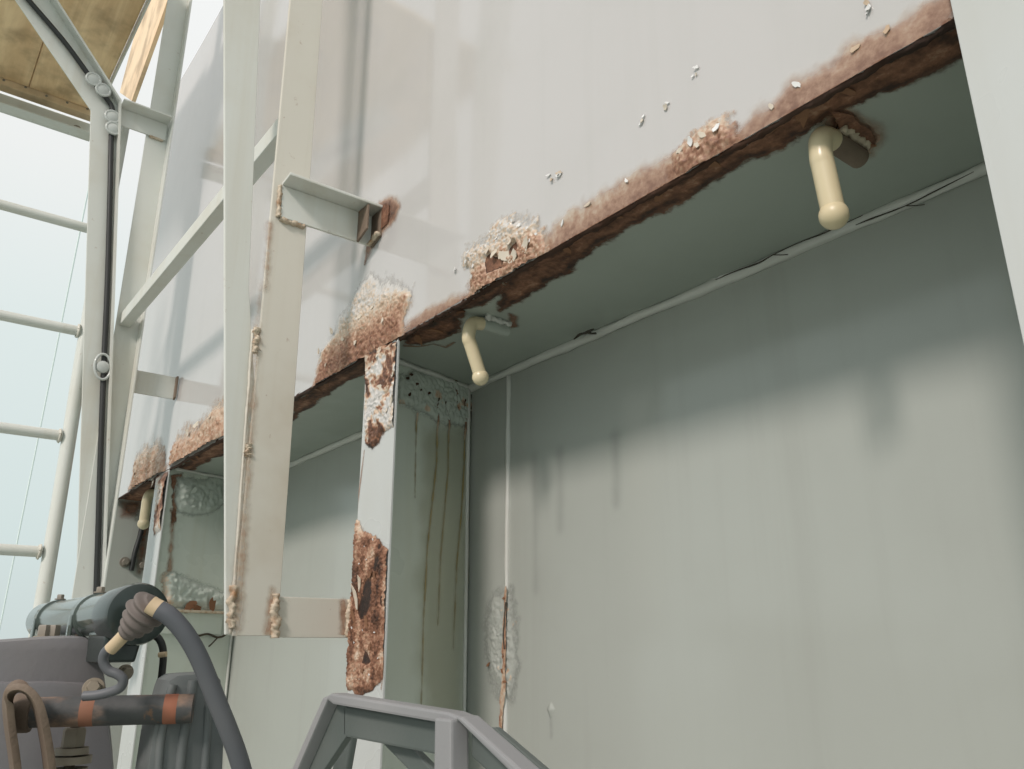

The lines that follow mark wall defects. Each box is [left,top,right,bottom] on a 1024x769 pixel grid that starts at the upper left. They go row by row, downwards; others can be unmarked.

rust [723,0,953,153]
rust [379,197,400,232]
peeling [453,212,550,298]
rust [545,157,712,251]
rust [404,286,486,348]
rust [232,459,250,631]
rust [340,520,388,695]